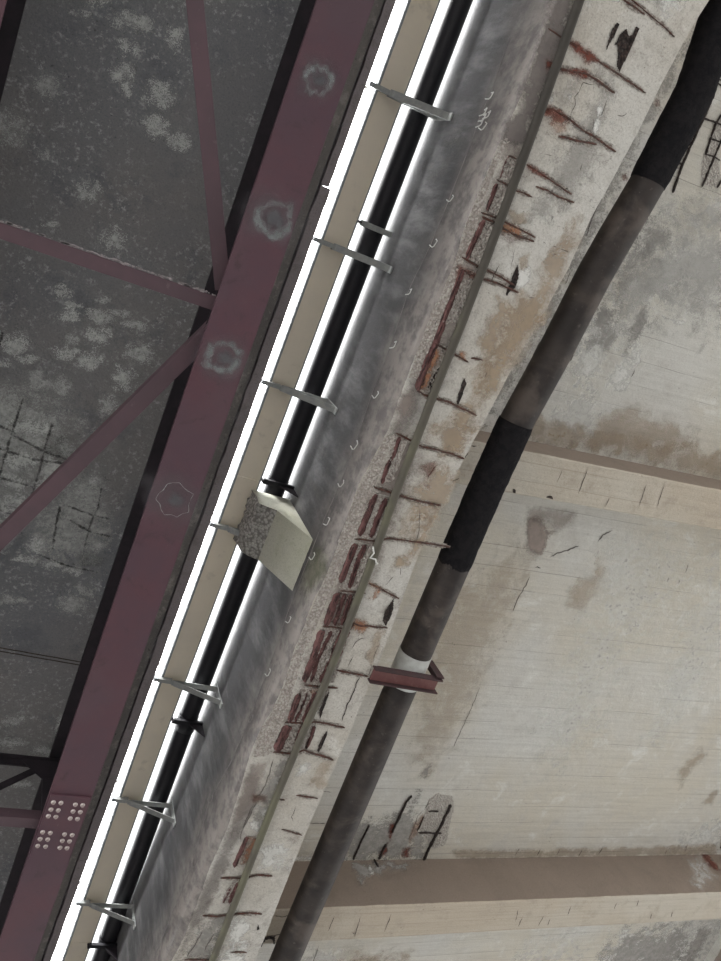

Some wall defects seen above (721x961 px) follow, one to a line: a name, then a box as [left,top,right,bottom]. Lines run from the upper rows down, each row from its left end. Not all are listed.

rust [546,41,598,79]
spalling [547,23,646,94]
spalling [623,0,675,37]
rust [544,105,569,124]
spalling [546,106,616,153]
spalling [672,79,721,193]
spalling [409,138,575,417]
damp [551,219,721,442]
crack [0,400,66,494]
crack [47,488,109,572]
crack [513,530,612,610]
spalling [203,835,275,947]